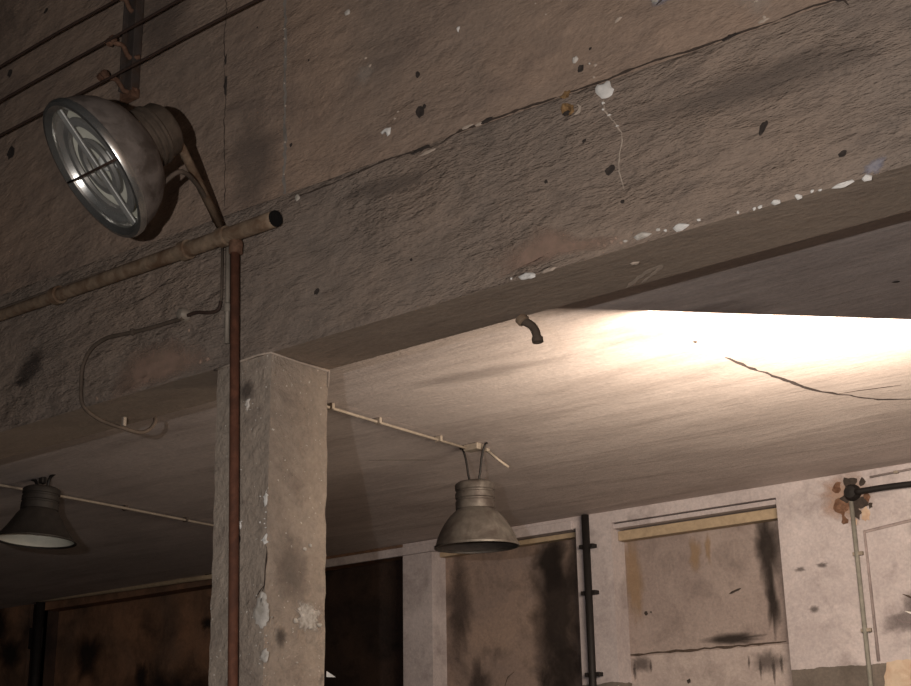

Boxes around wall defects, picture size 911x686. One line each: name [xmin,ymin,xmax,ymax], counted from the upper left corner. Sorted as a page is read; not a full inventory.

crack [290,0,849,201]
crack [725,357,911,400]
damp [538,544,561,583]
peeling [252,591,272,665]
peeling [294,604,322,630]
damp [768,580,779,624]
peeling [884,659,911,686]